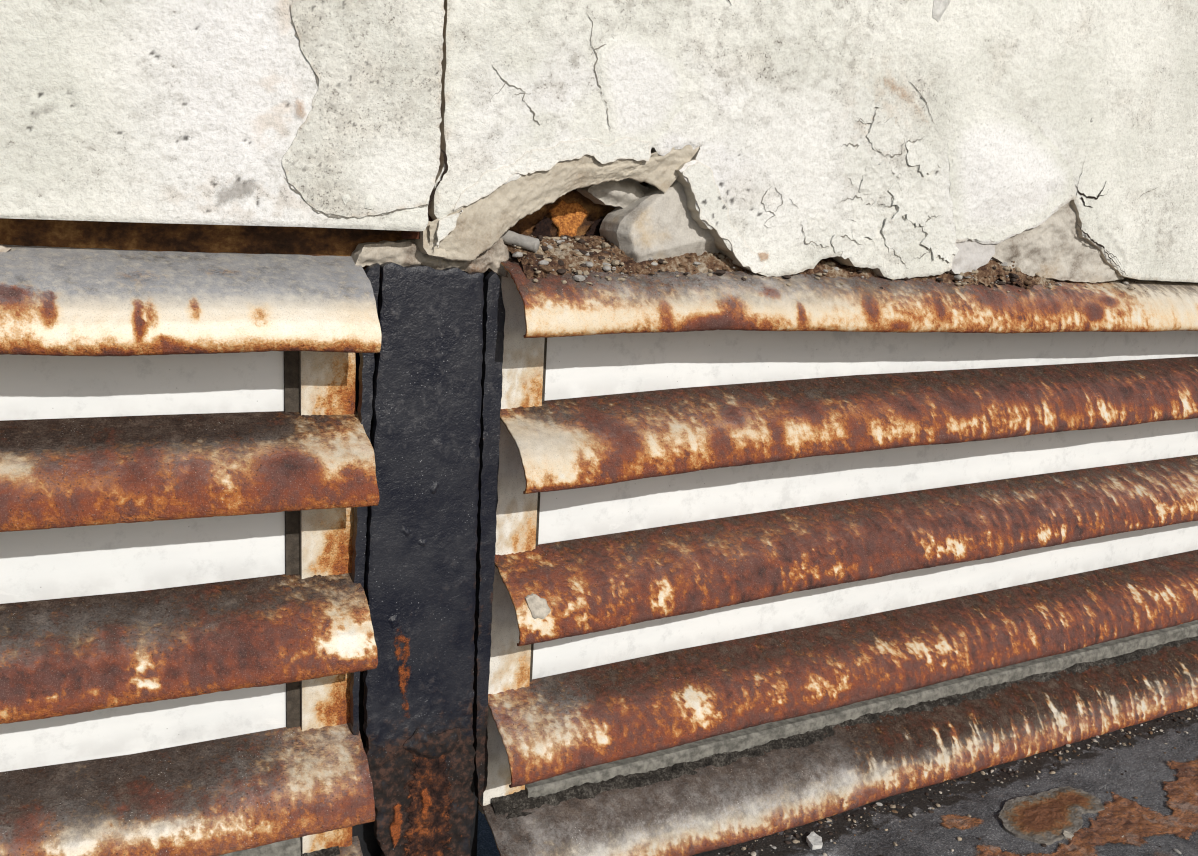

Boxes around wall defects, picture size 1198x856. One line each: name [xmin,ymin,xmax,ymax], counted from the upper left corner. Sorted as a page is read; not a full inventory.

peeling [282,0,445,219]
crack [401,146,448,239]
crack [488,65,540,125]
spalling [415,33,766,273]
crack [586,12,610,127]
peeling [801,86,1124,283]
crack [1076,163,1126,274]
rust [390,635,462,856]
rust [941,814,983,830]
rust [975,759,1198,856]